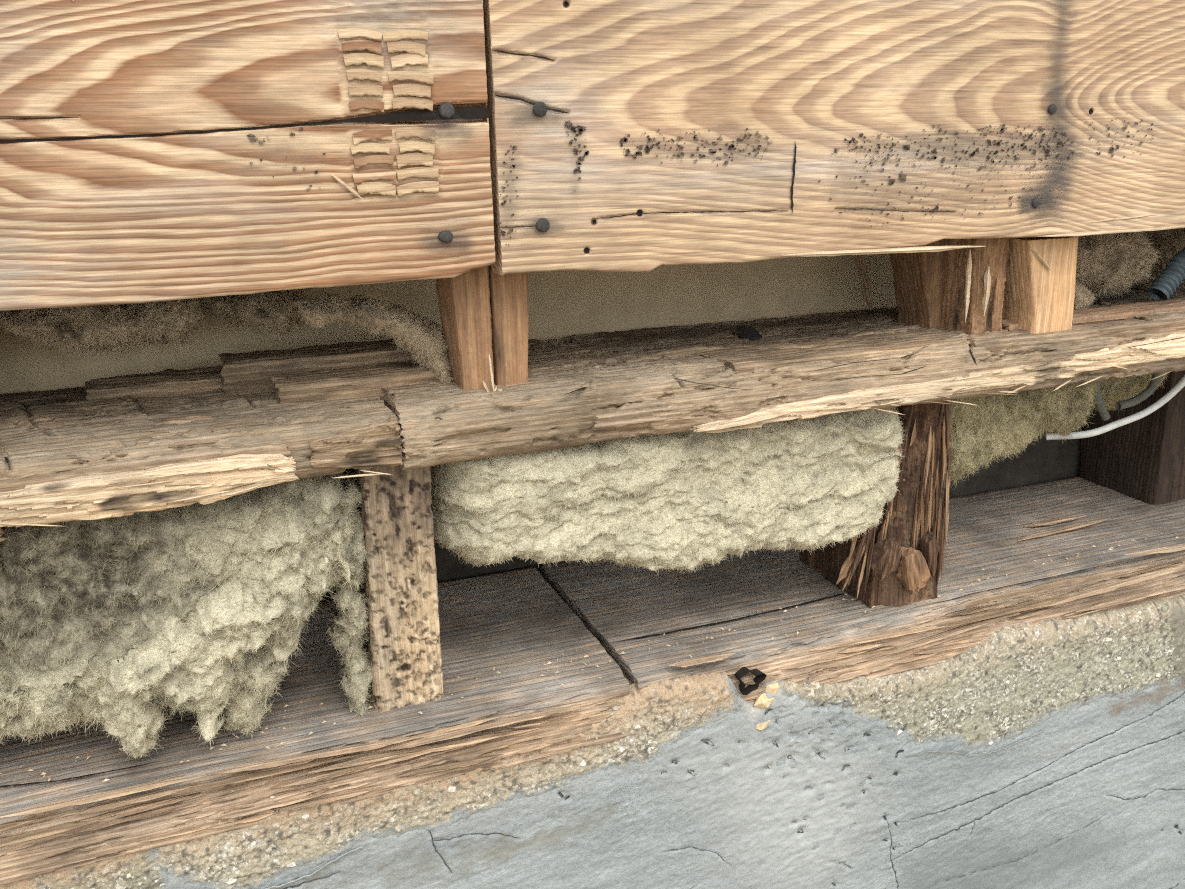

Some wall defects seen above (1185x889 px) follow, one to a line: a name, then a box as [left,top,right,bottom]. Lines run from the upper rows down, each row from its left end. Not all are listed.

mould [564,120,589,192]
mould [620,128,772,166]
water stain [831,79,1075,227]
water stain [1086,119,1154,157]
spalling [765,594,1185,758]
spalling [0,672,744,889]
crack [887,691,1185,888]
crack [283,872,339,889]
crack [429,831,517,873]
crack [665,846,730,865]